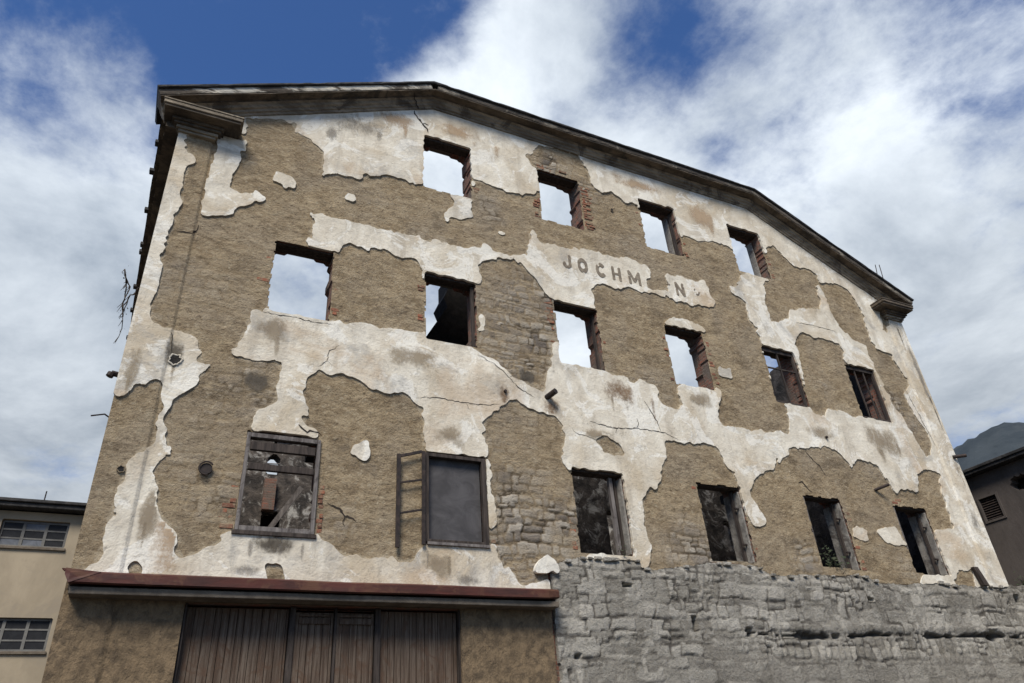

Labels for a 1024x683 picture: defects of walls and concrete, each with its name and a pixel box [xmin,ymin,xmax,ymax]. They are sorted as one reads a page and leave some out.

flaking render [71,118,789,586]
crack [573,402,677,441]
crack [328,503,356,526]
flaking render [642,441,953,585]